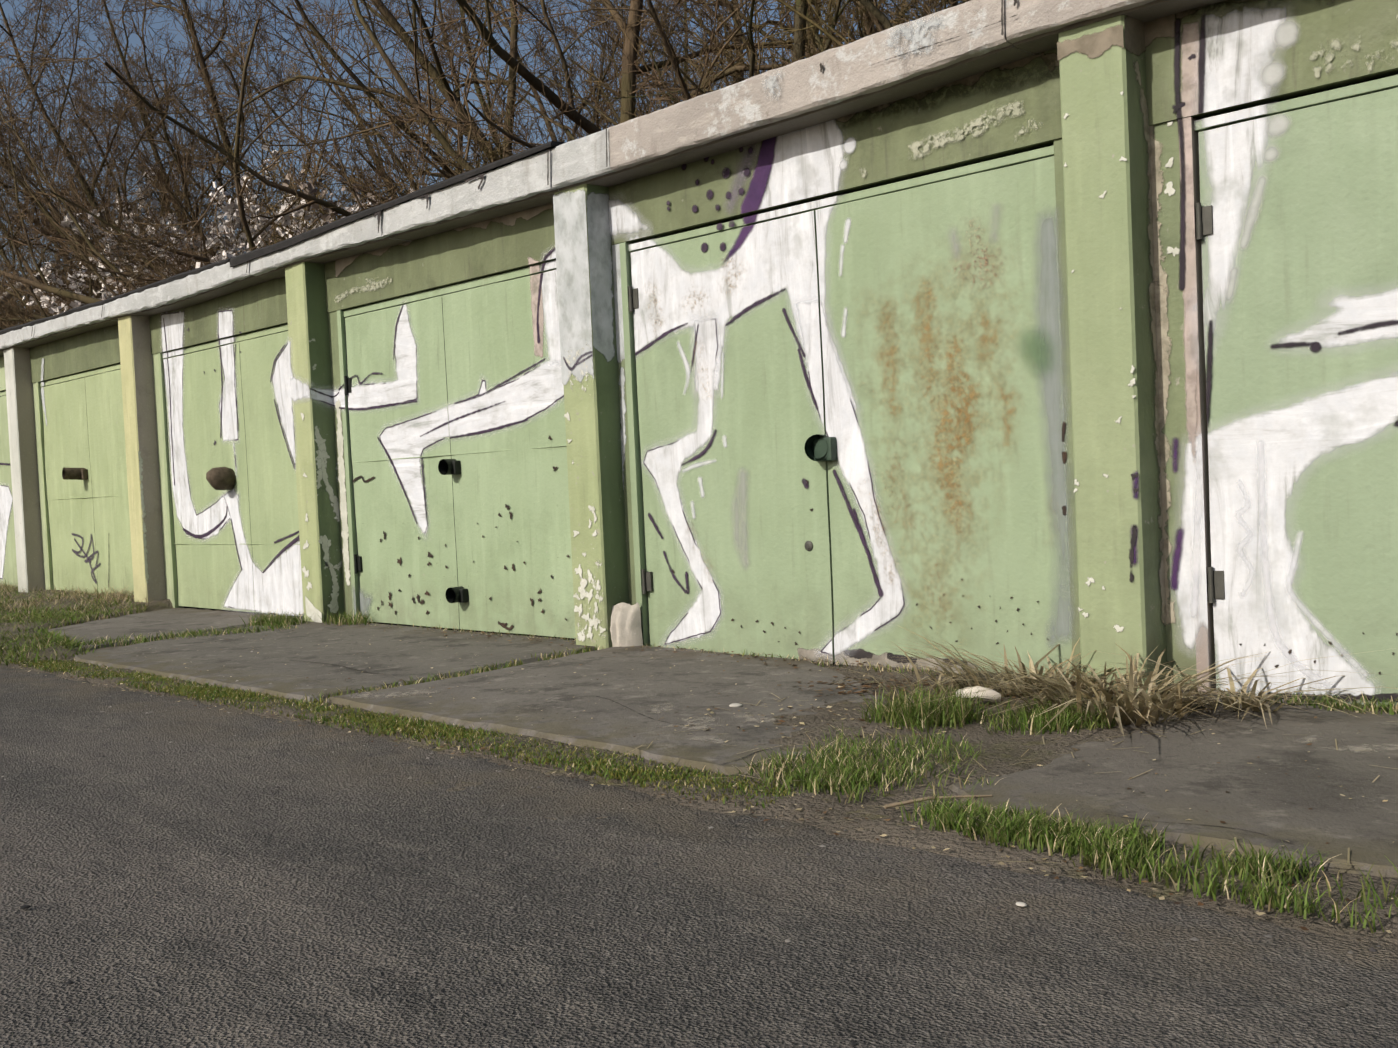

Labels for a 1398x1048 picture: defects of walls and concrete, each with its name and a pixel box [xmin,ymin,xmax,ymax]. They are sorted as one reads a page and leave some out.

peeling [1310,40,1398,78]
rust [921,316,976,510]
peeling [377,557,441,615]
peeling [530,506,606,642]